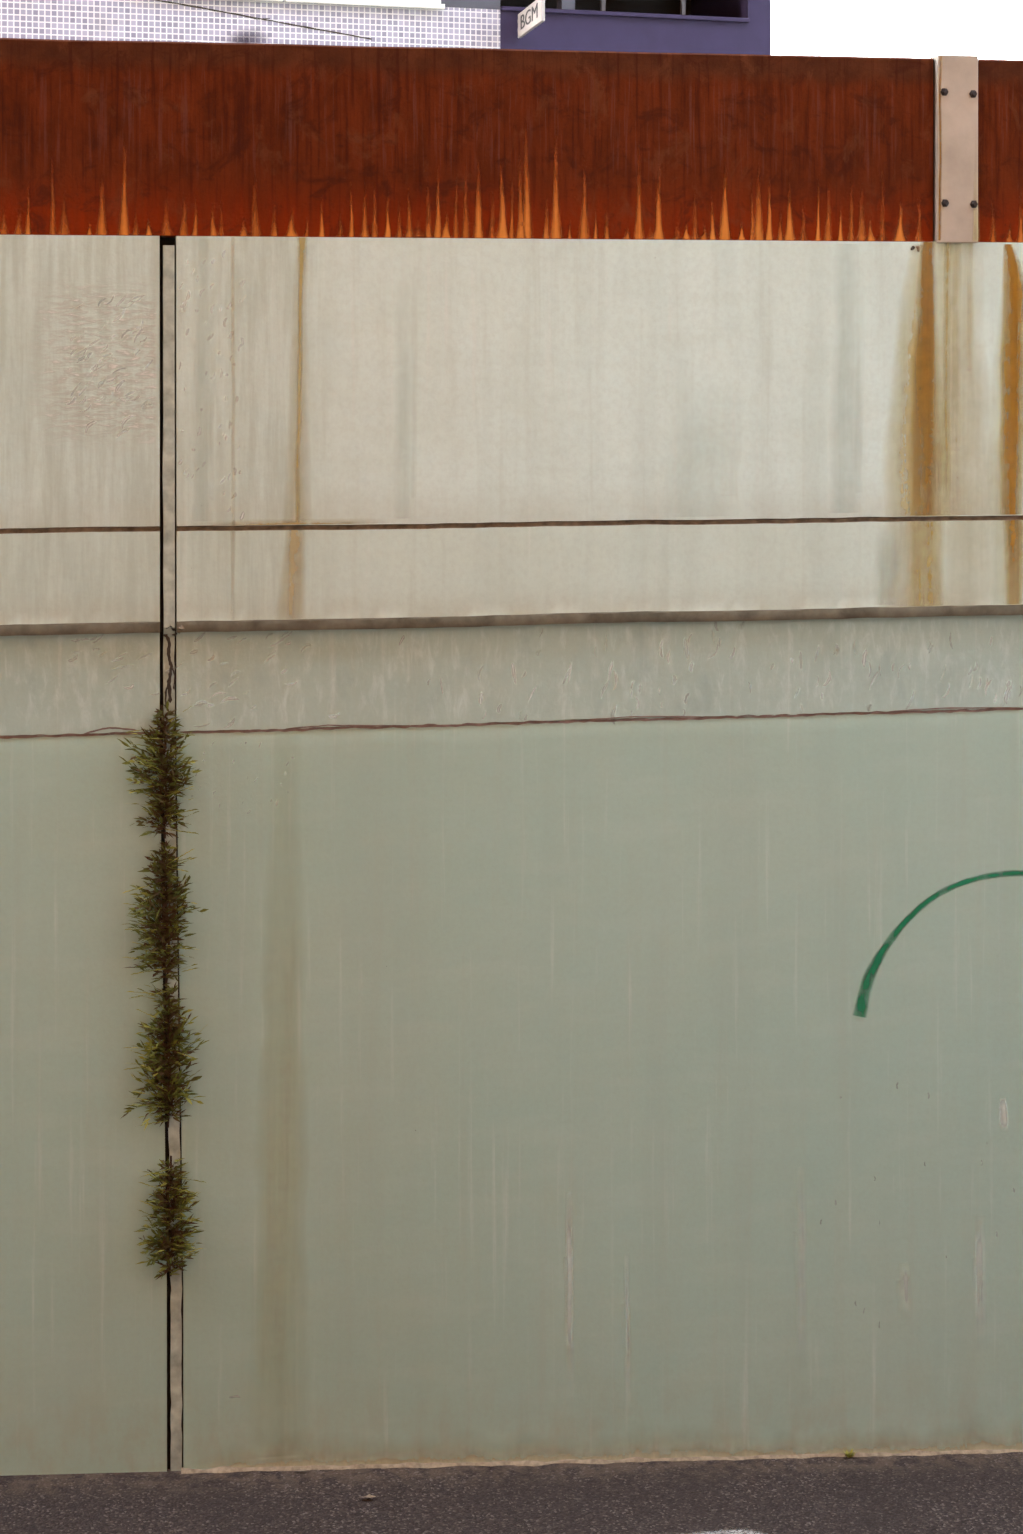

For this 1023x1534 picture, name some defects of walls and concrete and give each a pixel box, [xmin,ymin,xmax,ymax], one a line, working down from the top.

corrosion [0,204,31,234]
corrosion [50,192,68,235]
corrosion [87,56,949,527]